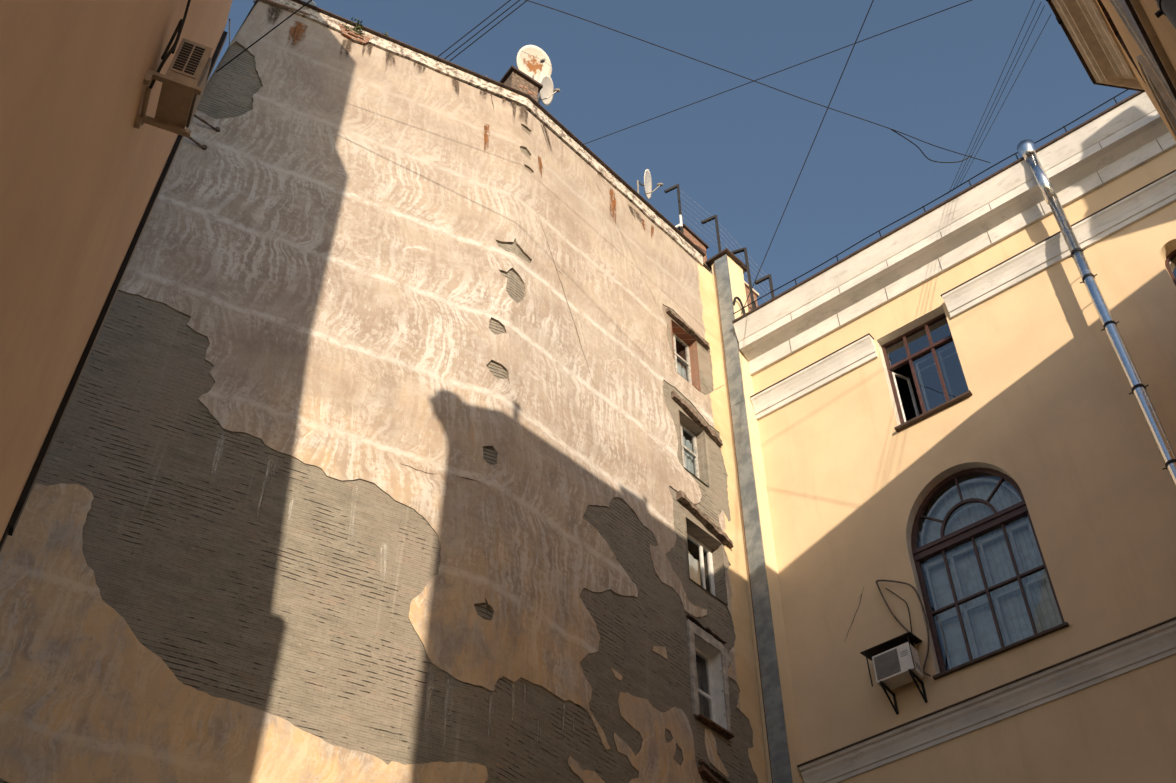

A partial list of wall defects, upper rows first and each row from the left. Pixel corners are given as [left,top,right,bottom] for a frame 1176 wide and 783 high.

rust [289,21,307,42]
water stain [340,40,372,54]
flaking render [196,41,263,120]
water stain [503,98,528,123]
flaking render [35,290,759,783]